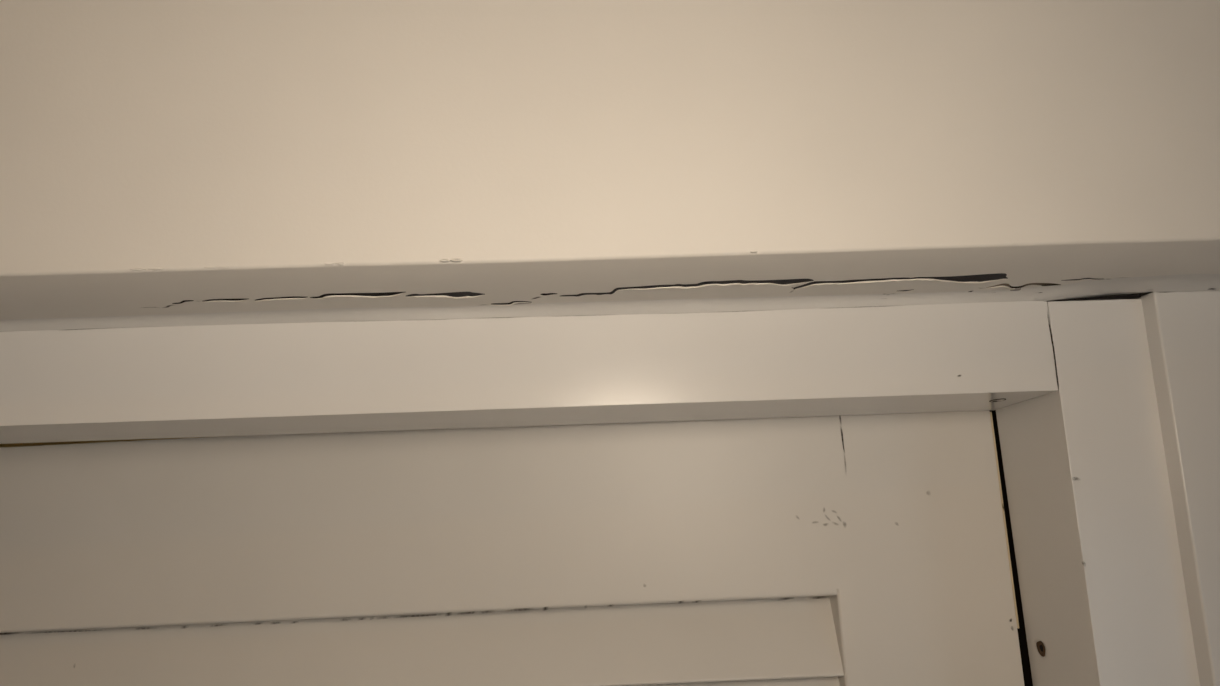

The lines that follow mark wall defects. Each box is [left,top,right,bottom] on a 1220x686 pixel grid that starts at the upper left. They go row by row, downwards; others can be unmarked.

crack [166,273,1141,385]